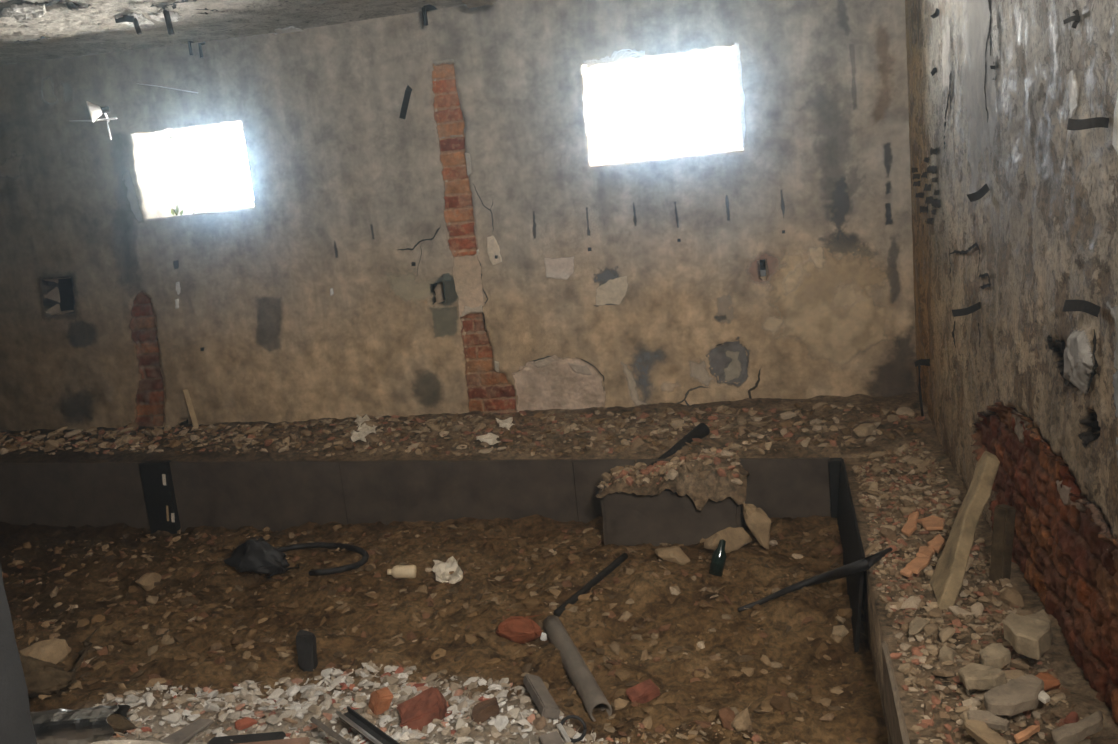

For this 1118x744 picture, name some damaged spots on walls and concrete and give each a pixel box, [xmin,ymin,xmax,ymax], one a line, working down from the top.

spalling [432,59,502,265]
spalling [691,337,750,387]
spalling [970,401,1118,725]